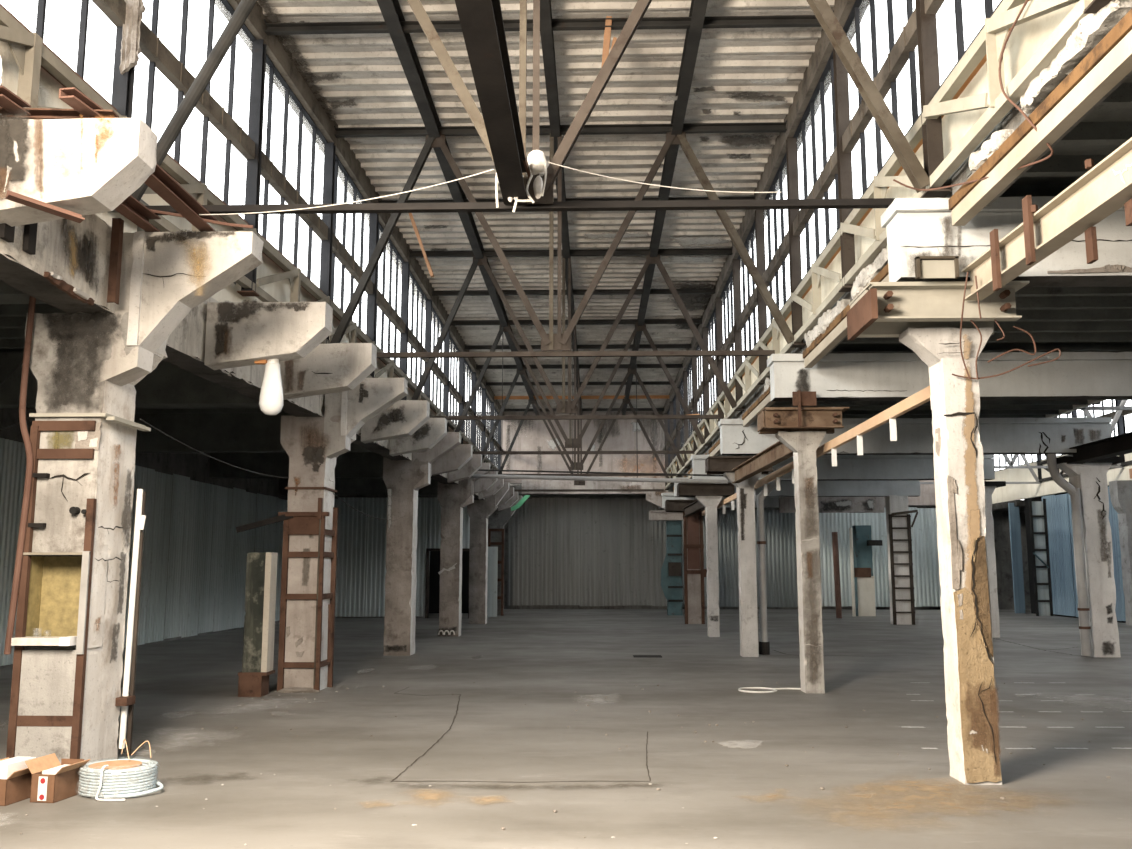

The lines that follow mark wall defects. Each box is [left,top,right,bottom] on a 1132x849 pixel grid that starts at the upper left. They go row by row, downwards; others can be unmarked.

leakage [215,300,309,356]
leakage [46,314,116,411]
crack [1039,432,1050,456]
crack [49,473,89,500]
crack [1094,477,1106,520]
peeling [947,475,1002,783]